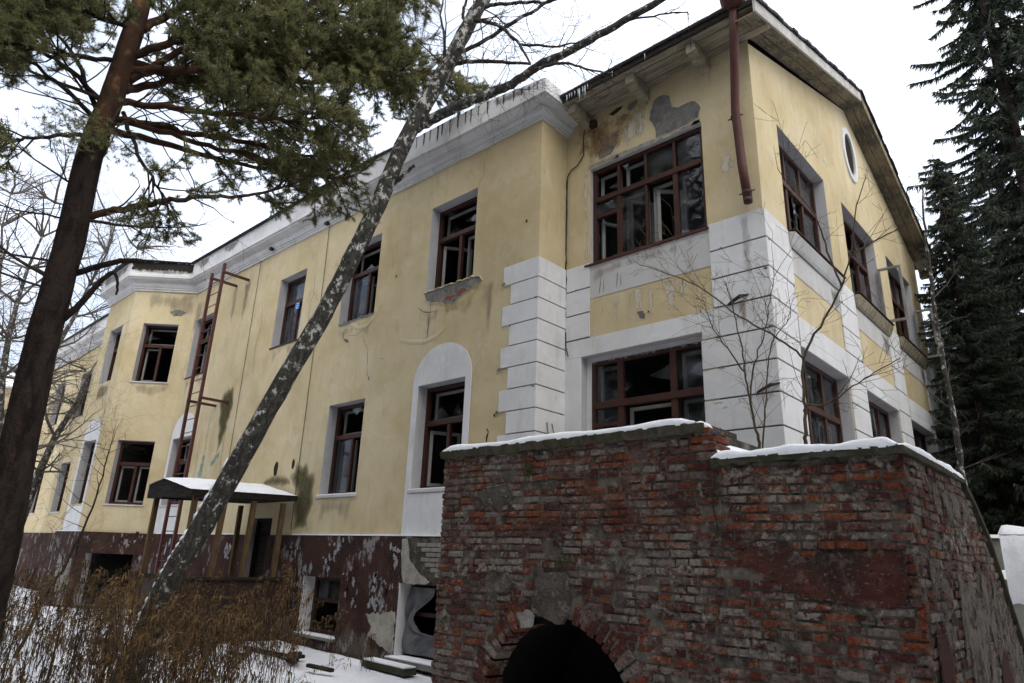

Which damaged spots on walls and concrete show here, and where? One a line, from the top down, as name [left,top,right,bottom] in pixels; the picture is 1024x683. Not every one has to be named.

flaking render [589,93,702,170]
flaking render [423,275,483,305]
peeling [111,531,146,548]
flaking render [290,537,441,655]